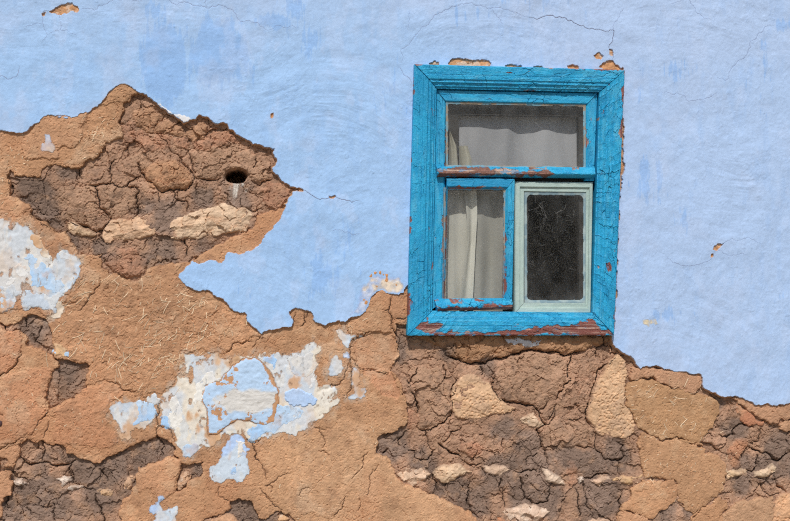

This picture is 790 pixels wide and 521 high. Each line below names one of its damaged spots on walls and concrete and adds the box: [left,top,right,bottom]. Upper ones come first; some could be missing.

flaking render [42,3,79,16]
crack [400,0,614,81]
spalling [0,84,477,521]
crack [385,298,406,351]
crack [332,332,387,393]
spalling [376,324,790,521]
crack [250,440,285,508]
crack [334,454,378,516]